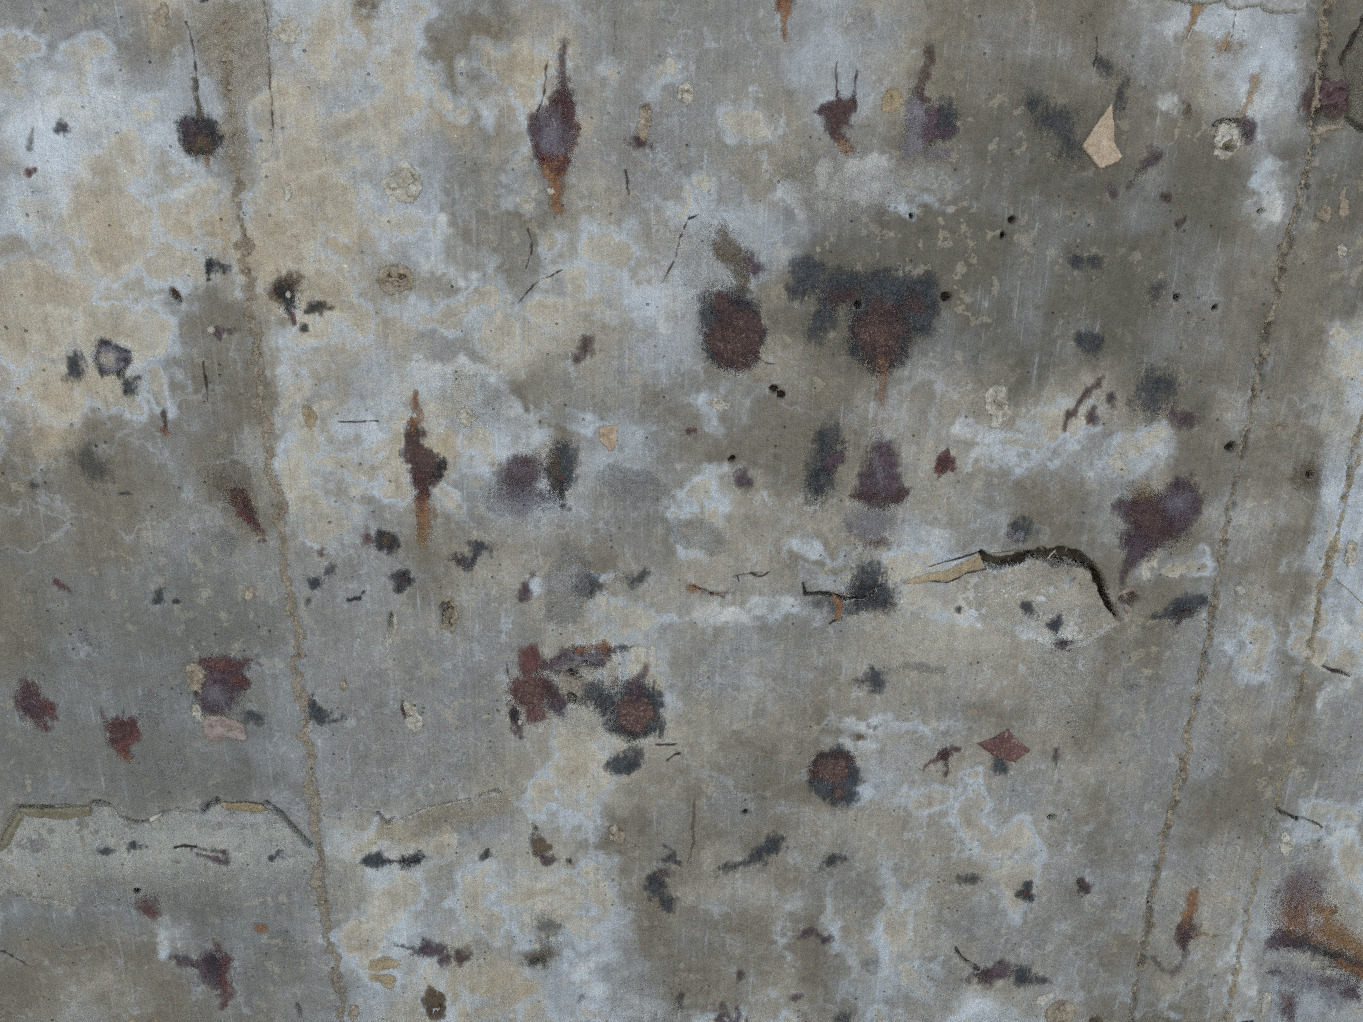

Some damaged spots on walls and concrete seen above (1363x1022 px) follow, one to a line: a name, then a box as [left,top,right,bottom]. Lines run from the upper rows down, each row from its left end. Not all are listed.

rust [528,43,579,214]
rust [815,63,858,153]
spalling [1082,104,1122,169]
rust [400,390,447,536]
rust [1111,477,1203,584]
rust [194,655,251,715]
rust [245,710,263,724]
rust [507,641,632,723]